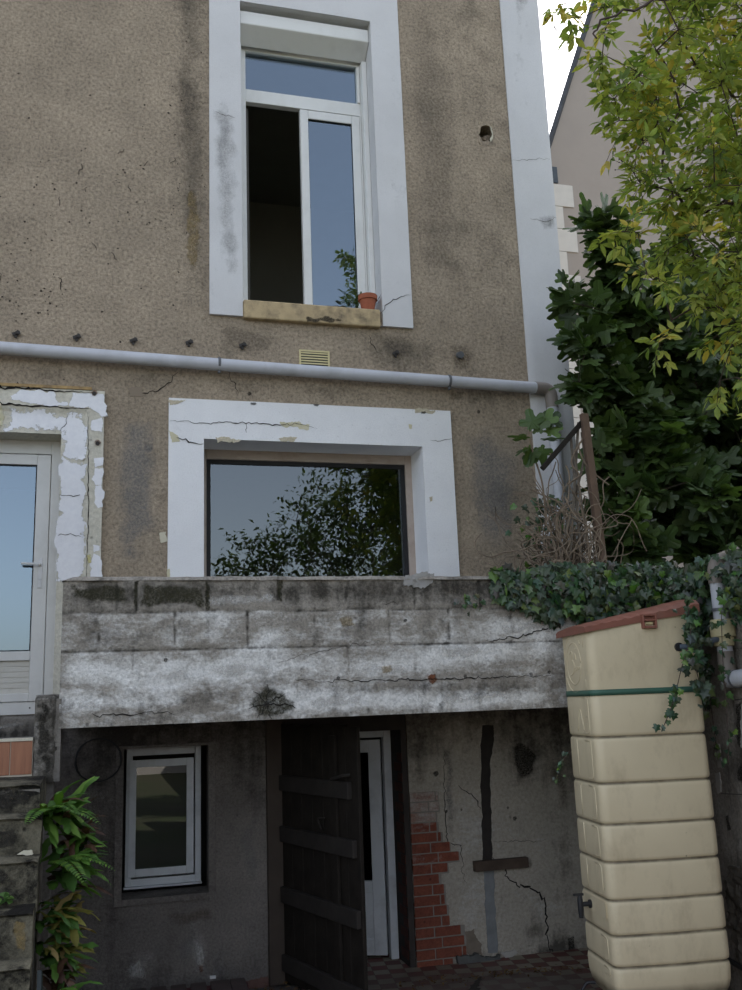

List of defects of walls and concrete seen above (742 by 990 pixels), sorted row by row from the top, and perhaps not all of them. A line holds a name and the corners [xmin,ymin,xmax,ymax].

crack [174,420,314,445]
peeling [3,389,108,582]
crack [93,710,174,718]
damp [251,688,294,716]
crack [249,640,551,719]
flaking render [394,753,482,968]
crack [492,840,553,952]